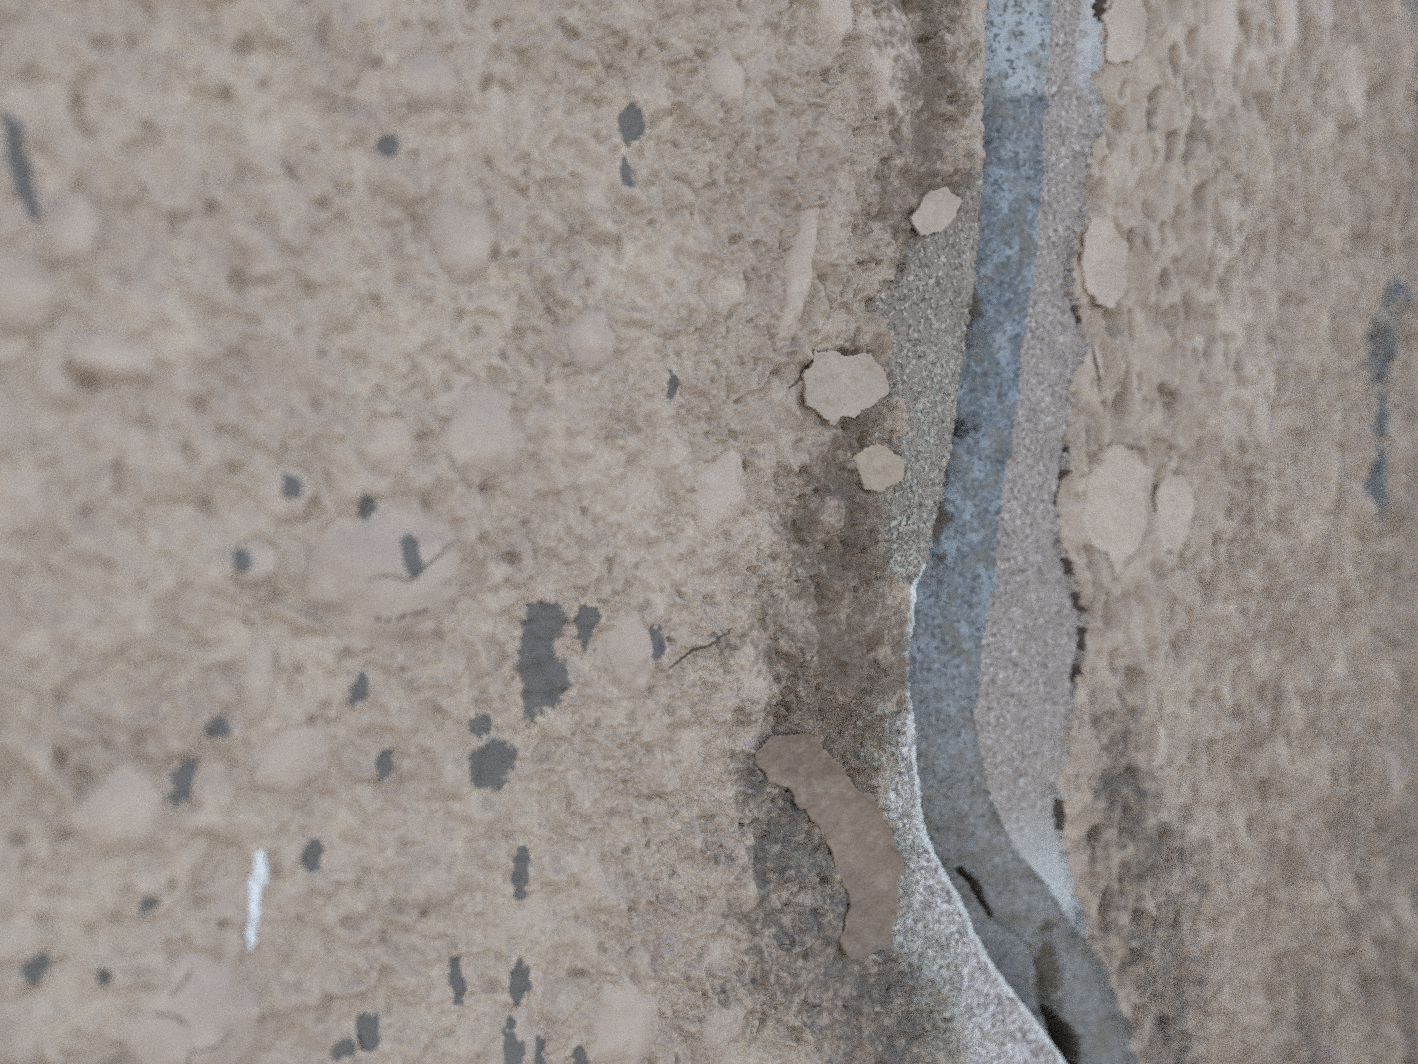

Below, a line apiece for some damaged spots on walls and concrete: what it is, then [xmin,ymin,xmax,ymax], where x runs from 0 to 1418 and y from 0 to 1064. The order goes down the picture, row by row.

spalling [801,158,985,585]
spalling [753,709,1063,1064]
crack [901,0,1139,1064]
spalling [973,0,1196,937]